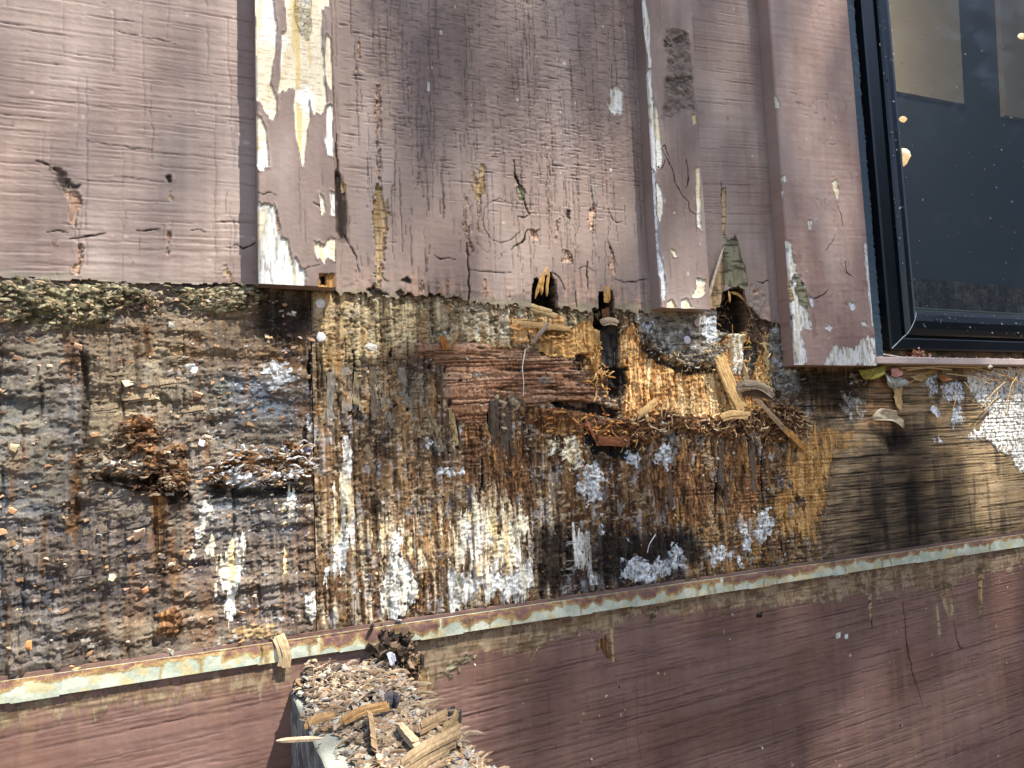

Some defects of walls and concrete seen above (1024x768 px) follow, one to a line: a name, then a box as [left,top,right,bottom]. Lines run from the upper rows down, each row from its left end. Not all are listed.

peeling [255,0,334,170]
crack [52,230,106,239]
peeling [257,202,336,287]
crack [313,134,388,282]
crack [434,160,530,301]
crack [659,145,695,214]
spalling [584,241,833,461]
peeling [824,243,876,366]
leakage [925,367,1024,474]
rust [152,494,177,588]
peeling [231,623,292,668]
rust [0,534,1024,694]